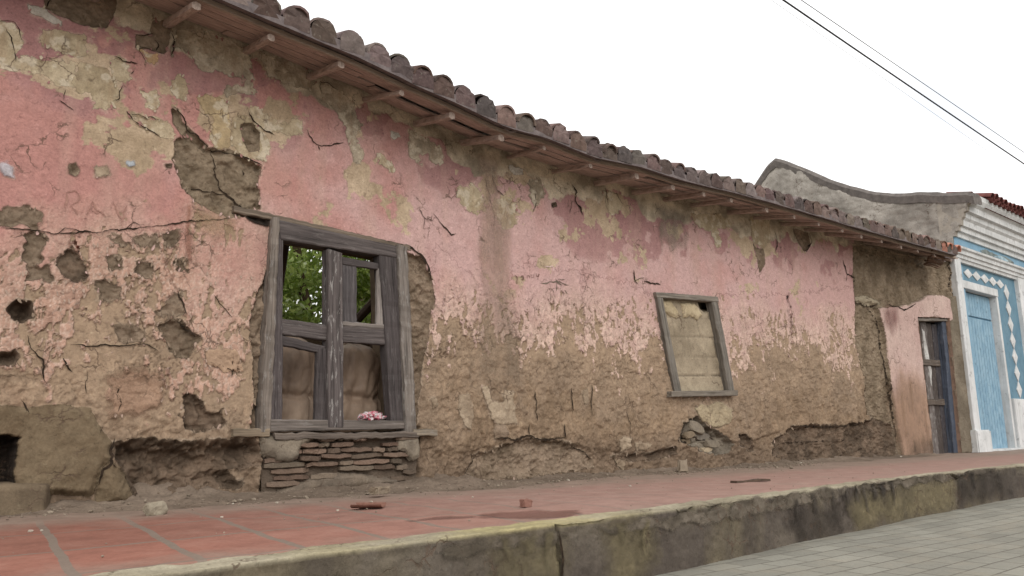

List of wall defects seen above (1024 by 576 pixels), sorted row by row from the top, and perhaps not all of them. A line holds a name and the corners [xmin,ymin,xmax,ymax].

peeling [0,20,87,87]
peeling [128,29,395,173]
crack [1,218,227,234]
peeling [455,182,518,230]
peeling [514,164,557,209]
peeling [0,205,269,433]
crack [28,337,158,390]
crack [786,423,862,443]
crack [557,531,565,576]